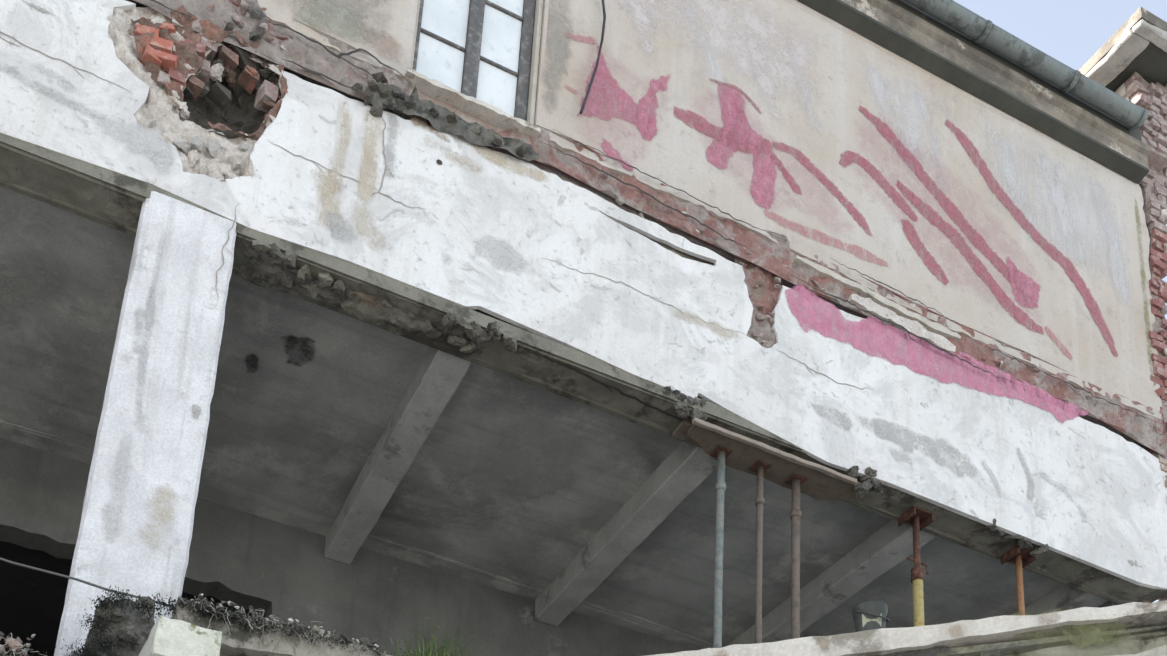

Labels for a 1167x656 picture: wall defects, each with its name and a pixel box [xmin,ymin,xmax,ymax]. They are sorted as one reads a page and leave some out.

crack [0,31,130,92]
spalling [107,0,288,181]
crack [268,117,423,209]
crack [541,129,785,253]
leakage [137,288,154,385]
crack [216,203,239,298]
spalling [284,336,315,366]
spalling [654,241,714,266]
spalling [734,252,782,348]